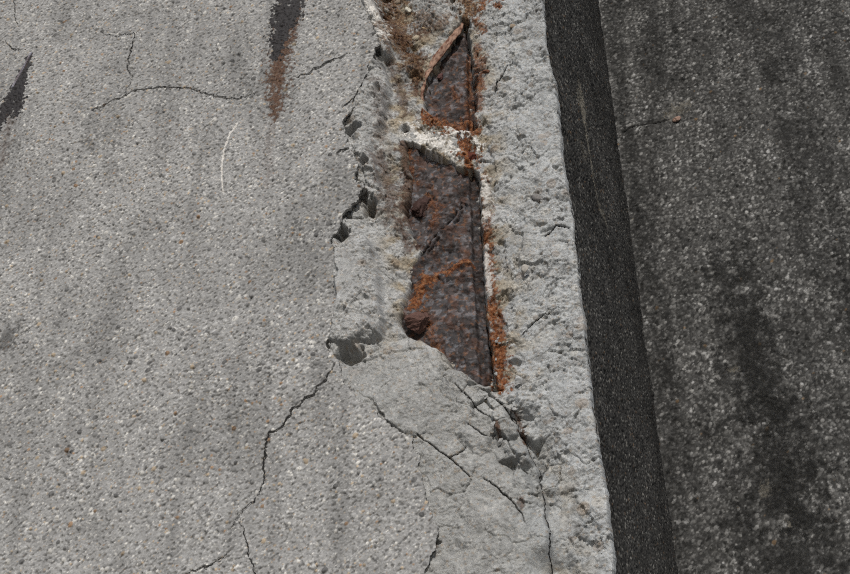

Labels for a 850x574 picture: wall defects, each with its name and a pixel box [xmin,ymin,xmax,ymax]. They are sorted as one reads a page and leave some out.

crack [92,32,256,111]
corrosion [262,0,308,123]
corrosion [374,0,513,394]
spalling [326,0,617,574]
crack [186,365,334,574]
crack [417,434,525,522]
crack [503,406,553,574]